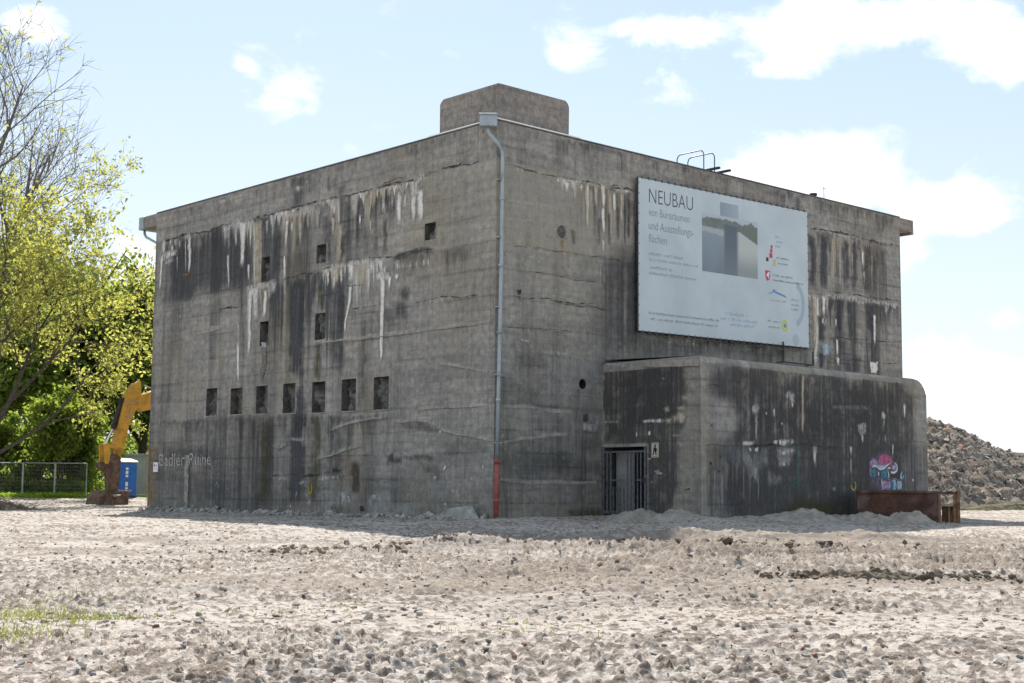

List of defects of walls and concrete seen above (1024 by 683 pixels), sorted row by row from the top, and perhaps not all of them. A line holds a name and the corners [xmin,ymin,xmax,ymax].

water stain [159,174,430,507]
crack [166,161,478,241]
crack [508,164,635,192]
crack [507,246,636,335]
water stain [557,178,636,344]
water stain [808,233,897,367]